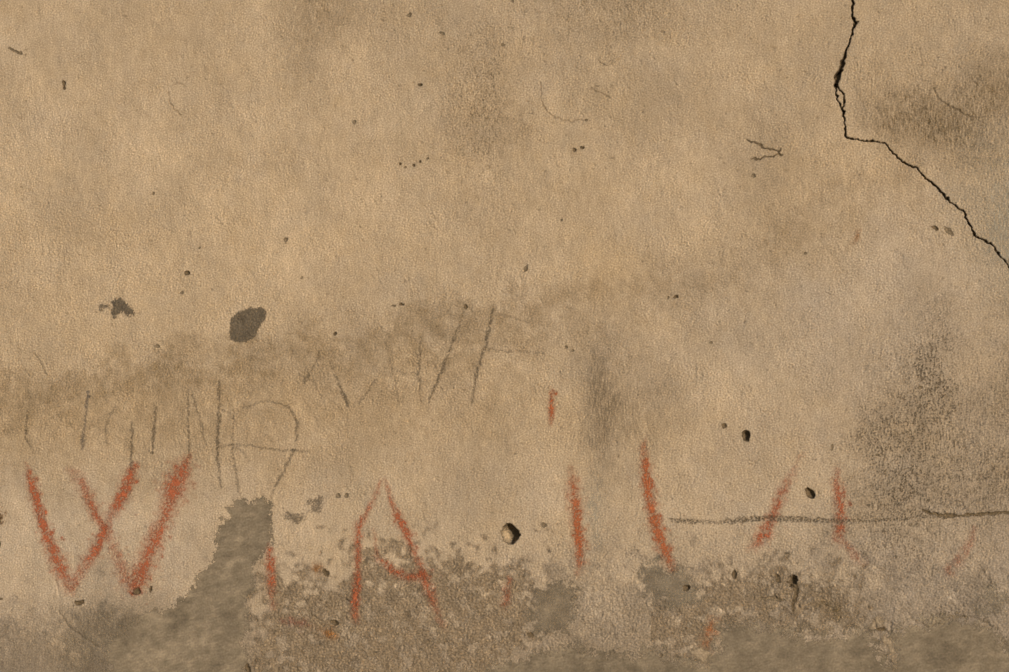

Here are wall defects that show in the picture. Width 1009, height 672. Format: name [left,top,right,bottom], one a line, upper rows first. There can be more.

crack [834,0,1009,268]
crack [746,139,783,161]
water stain [99,297,134,319]
water stain [230,307,266,342]
crack [725,515,861,524]
crack [922,509,1009,519]
spalling [68,496,1009,672]